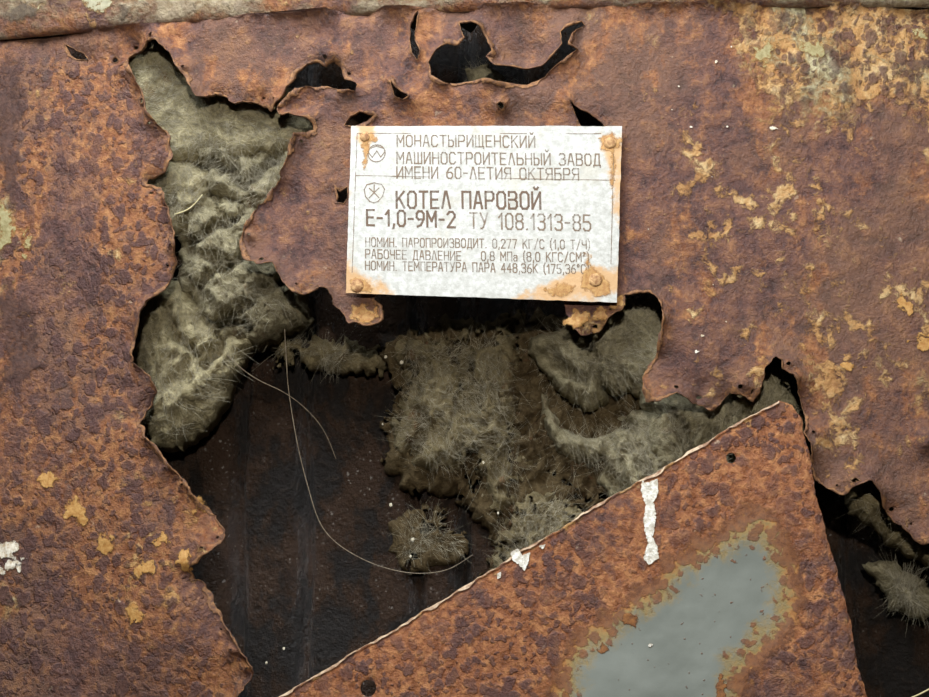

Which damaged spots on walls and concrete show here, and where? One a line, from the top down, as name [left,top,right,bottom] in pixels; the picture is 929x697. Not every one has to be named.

peeling [428,19,585,89]
peeling [752,40,774,67]
corrosion [360,132,378,168]
corrosion [598,132,622,185]
corrosion [352,304,379,324]
corrosion [544,255,625,328]
corrosion [897,292,913,316]
corrosion [907,332,929,352]
peeling [111,36,384,697]
peeling [36,466,59,489]
peeling [63,495,88,526]
peeling [97,533,115,555]